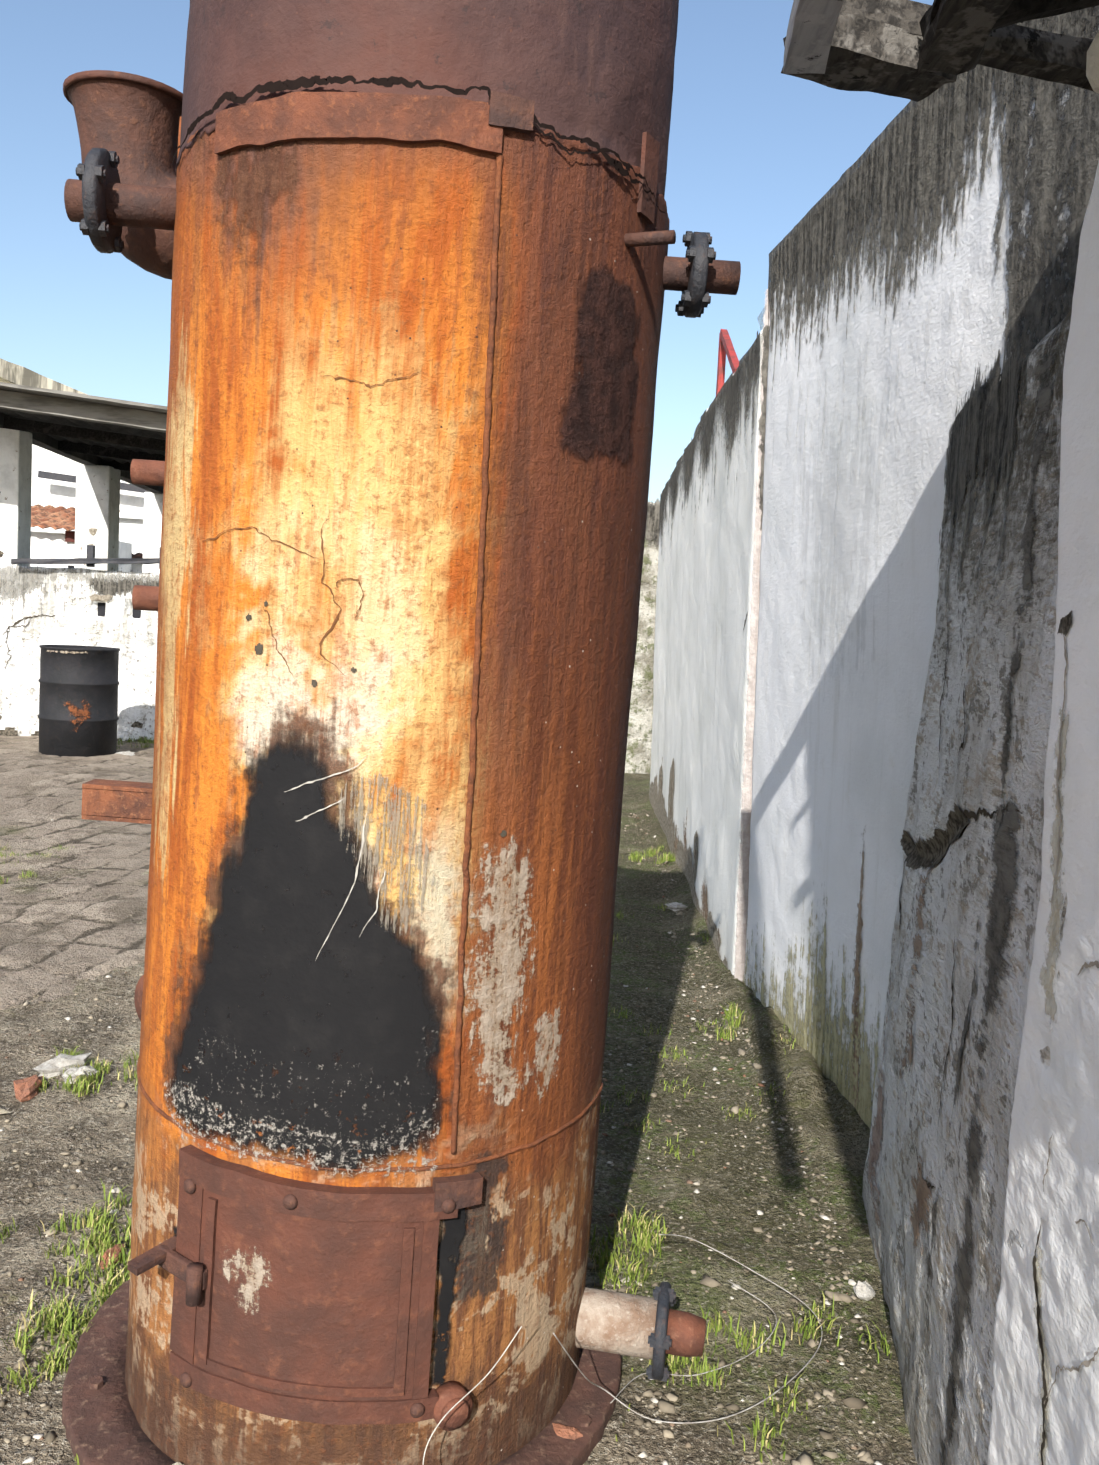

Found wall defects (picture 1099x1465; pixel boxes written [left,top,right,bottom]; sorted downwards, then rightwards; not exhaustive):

water stain [1016,5,1099,38]
water stain [645,64,1099,982]
water stain [0,564,159,631]
water stain [940,633,1021,1464]
water stain [926,1188,939,1290]